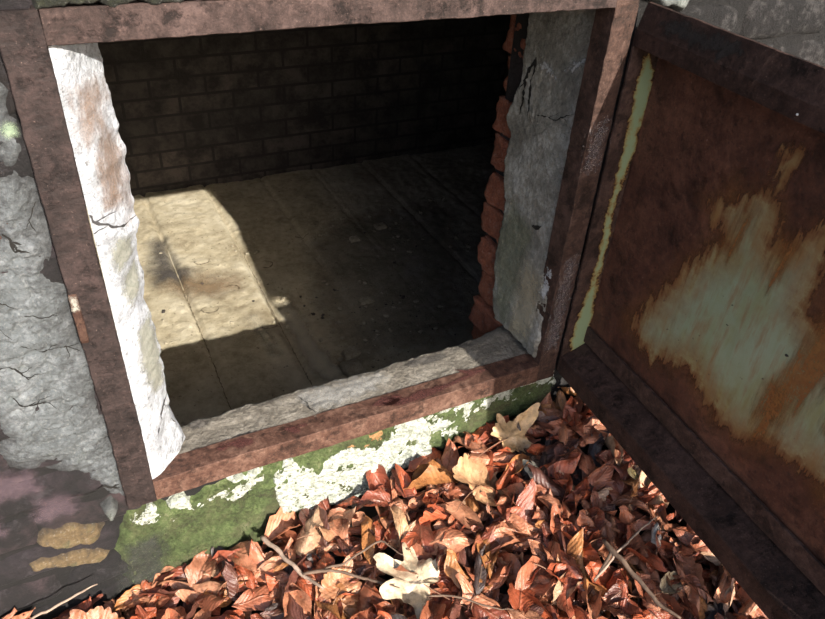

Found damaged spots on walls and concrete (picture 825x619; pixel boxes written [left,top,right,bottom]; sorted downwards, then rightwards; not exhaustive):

rust [80,81,103,144]
peeling [113,238,139,303]
crack [0,330,84,380]
crack [13,396,56,408]
rust [373,369,485,406]
rust [217,438,254,451]
flaking render [29,522,110,572]